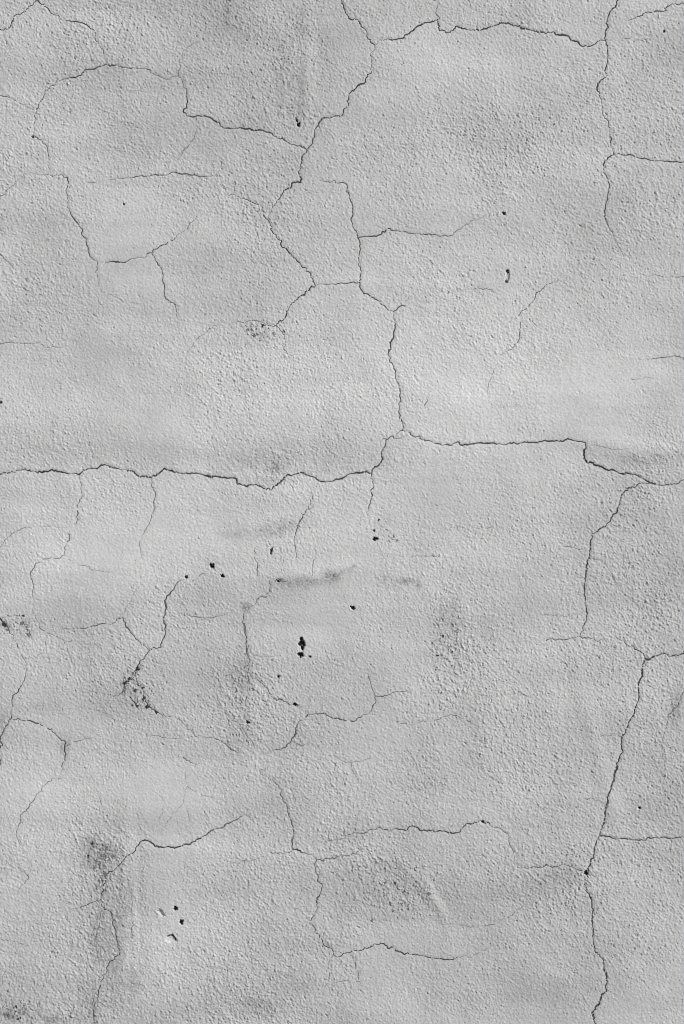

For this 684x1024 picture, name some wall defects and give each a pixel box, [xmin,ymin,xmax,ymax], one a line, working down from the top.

crack [0,0,684,769]
crack [76,815,243,1021]
crack [230,547,466,986]
crack [329,636,684,1024]